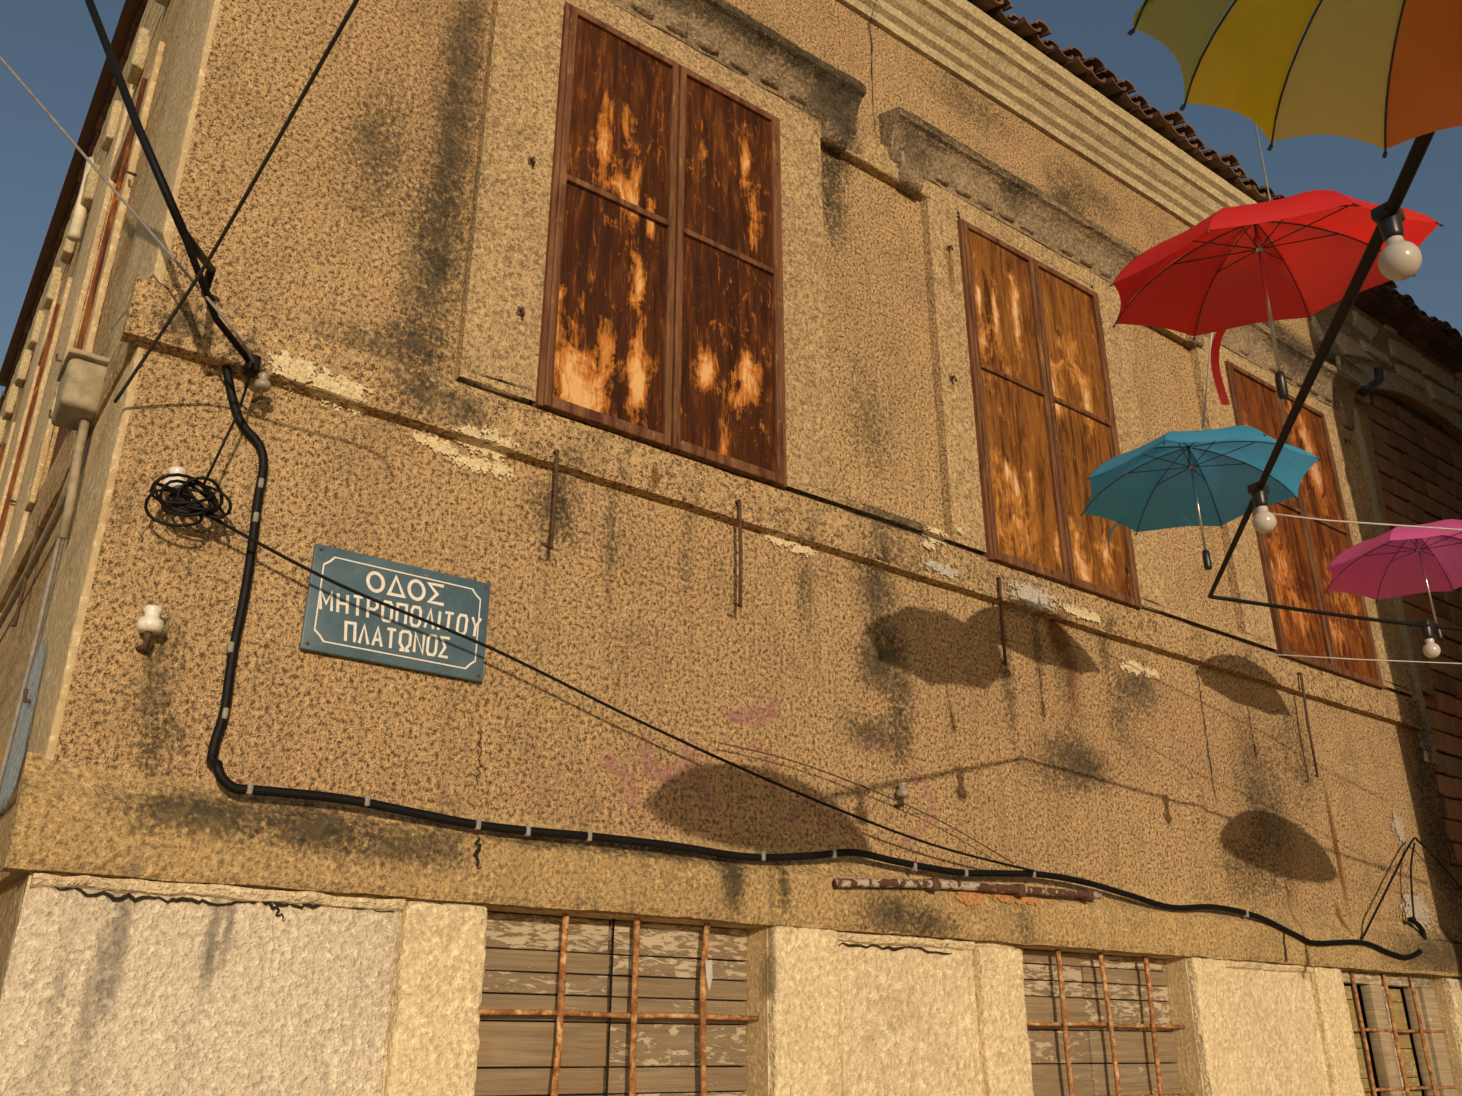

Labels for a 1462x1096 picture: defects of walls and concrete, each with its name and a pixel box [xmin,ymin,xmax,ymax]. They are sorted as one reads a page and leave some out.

leakage [344,0,492,425]
peeling [268,349,373,415]
peeling [405,422,521,480]
leakage [841,498,944,765]
leakage [1028,725,1111,793]
leakage [1225,706,1309,896]
crack [55,887,395,921]
crack [839,942,952,955]